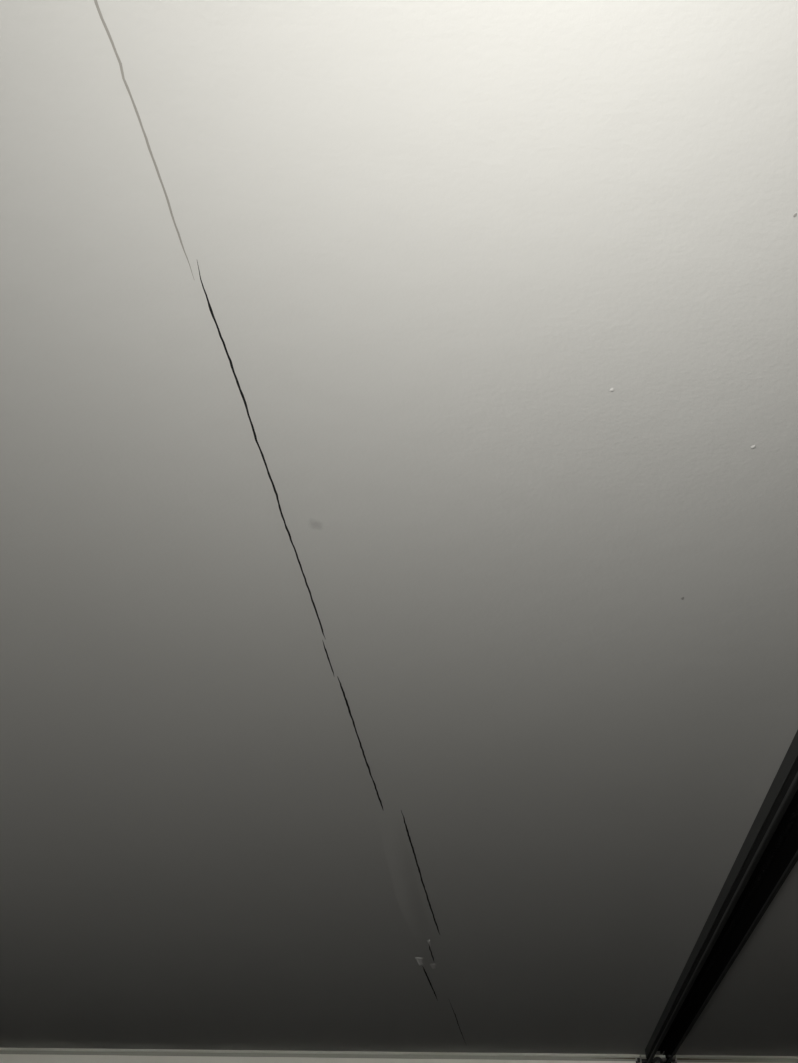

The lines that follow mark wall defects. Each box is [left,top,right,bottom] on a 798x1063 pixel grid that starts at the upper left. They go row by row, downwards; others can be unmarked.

crack [94,0,467,1046]